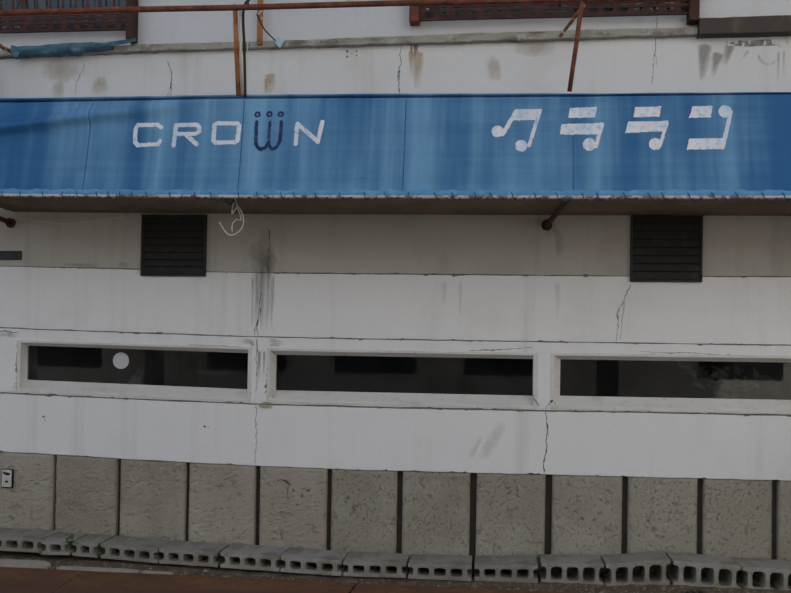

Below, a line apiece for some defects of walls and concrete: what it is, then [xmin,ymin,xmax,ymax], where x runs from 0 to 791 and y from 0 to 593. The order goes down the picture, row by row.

crack [254,230,270,460]
crack [616,285,631,341]
crack [532,393,549,472]